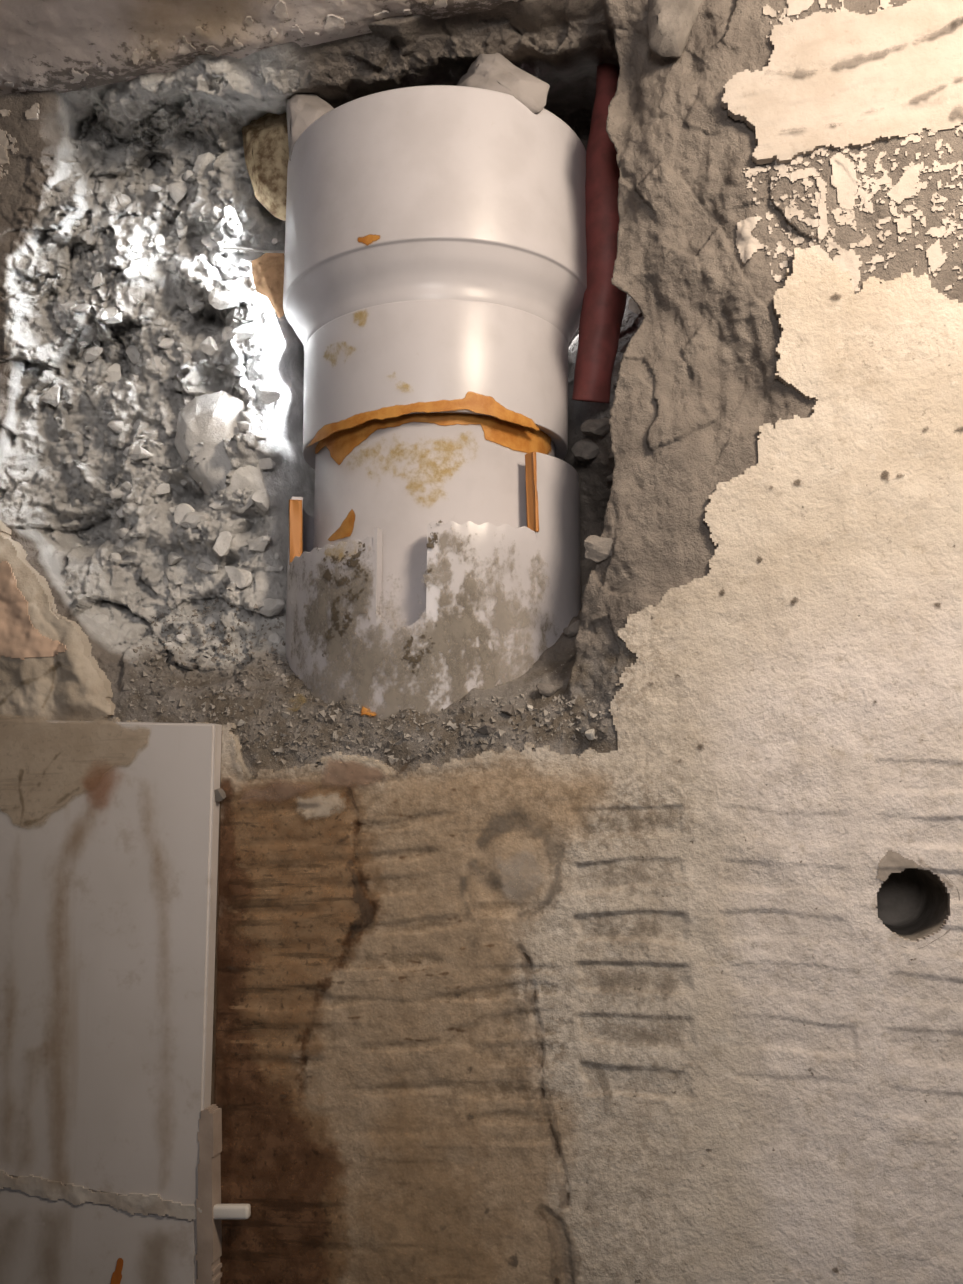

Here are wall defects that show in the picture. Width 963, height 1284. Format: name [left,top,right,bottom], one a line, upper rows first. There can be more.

spalling [0,0,963,818]
leakage [215,782,367,1284]